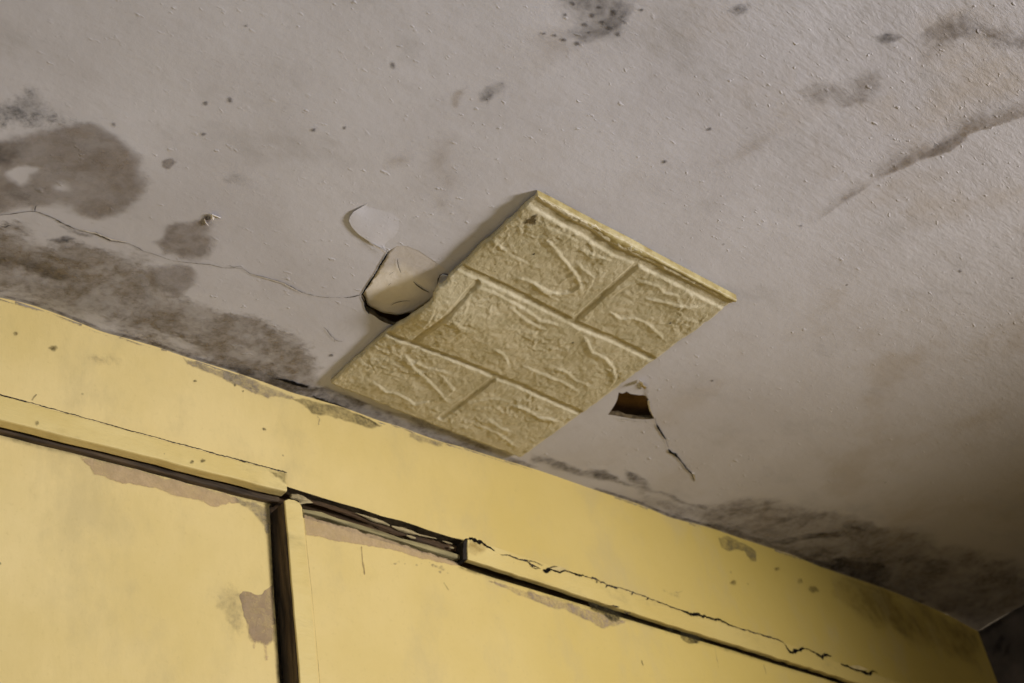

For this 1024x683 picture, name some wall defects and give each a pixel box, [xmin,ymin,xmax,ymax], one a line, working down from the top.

water stain [0,128,136,216]
crack [5,205,339,298]
flaking render [346,203,450,325]
peeling [83,459,269,532]
crack [656,424,694,479]
peeling [240,586,275,657]
crack [469,537,784,643]